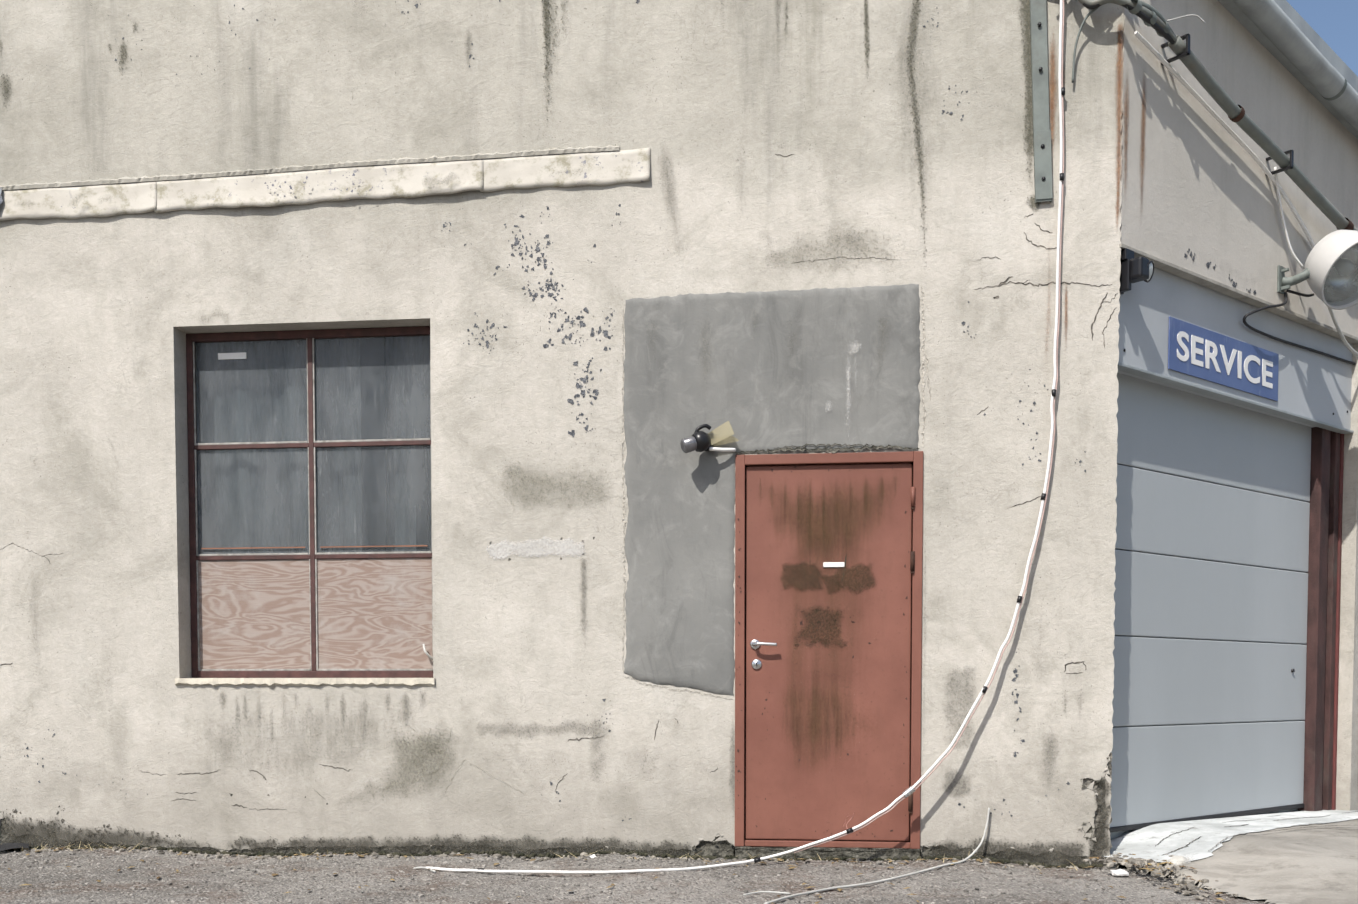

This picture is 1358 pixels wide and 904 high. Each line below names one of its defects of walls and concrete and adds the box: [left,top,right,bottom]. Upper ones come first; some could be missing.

damp [542,0,567,120]
damp [907,0,926,251]
corrosion [1117,28,1145,217]
crack [1026,214,1057,249]
peeling [463,312,507,354]
peeling [493,206,615,437]
crack [980,256,1116,348]
corrosion [782,562,874,592]
spalling [920,752,1112,866]